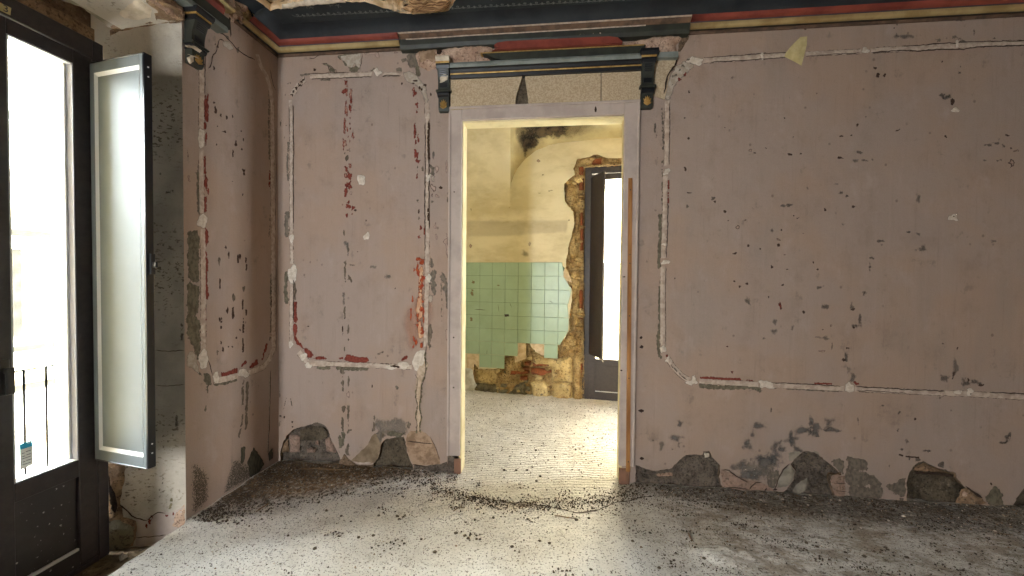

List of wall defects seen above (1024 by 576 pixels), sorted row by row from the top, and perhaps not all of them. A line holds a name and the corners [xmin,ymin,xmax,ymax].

peeling [188,94,244,213]
mould [521,126,567,156]
flaking render [473,155,622,399]
spalling [186,228,448,477]
mould [732,418,839,488]
spalling [635,451,1024,506]